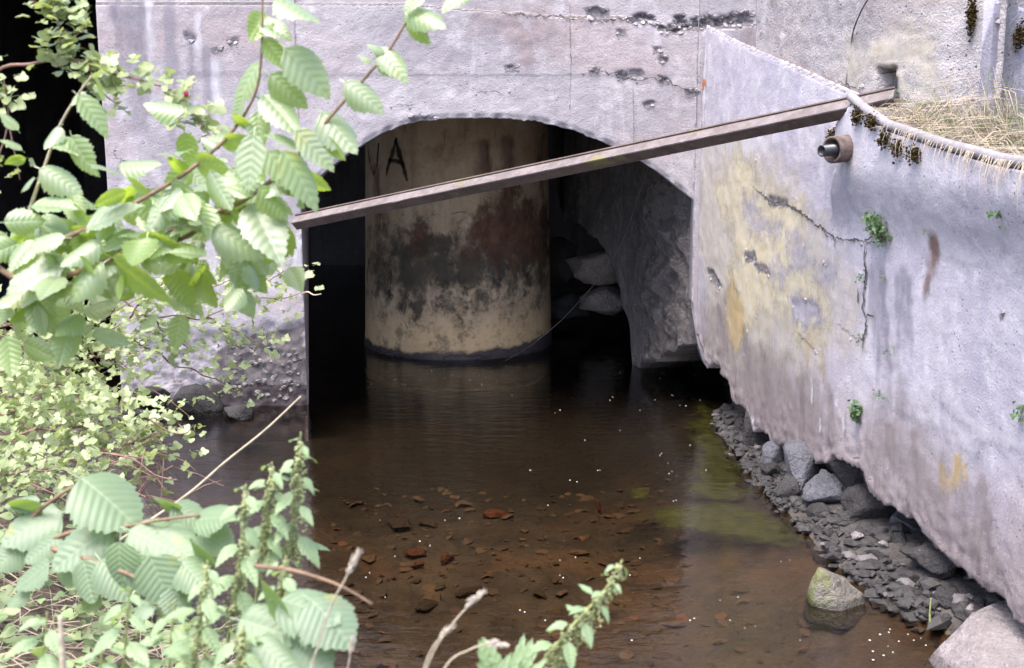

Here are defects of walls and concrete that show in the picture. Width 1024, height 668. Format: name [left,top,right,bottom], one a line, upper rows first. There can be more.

spalling [586,5,610,22]
spalling [616,9,756,35]
spalling [211,37,239,54]
spalling [616,68,644,82]
spalling [653,46,670,86]
damp [367,202,549,326]
peeling [700,141,836,382]
crack [754,187,875,349]
rust [925,235,938,288]